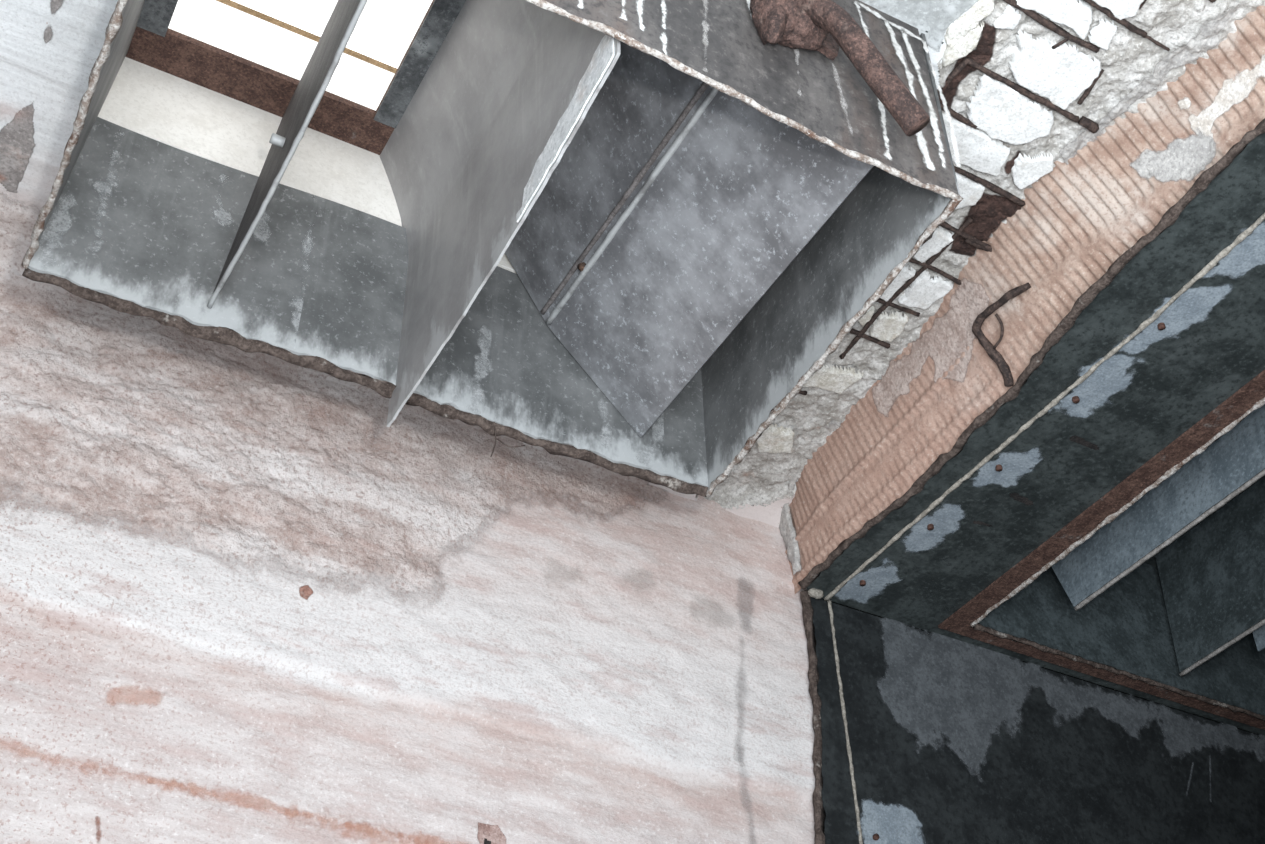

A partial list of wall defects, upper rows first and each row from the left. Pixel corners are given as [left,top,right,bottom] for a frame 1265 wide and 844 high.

peeling [44,0,63,43]
peeling [516,35,614,222]
spalling [696,0,1265,510]